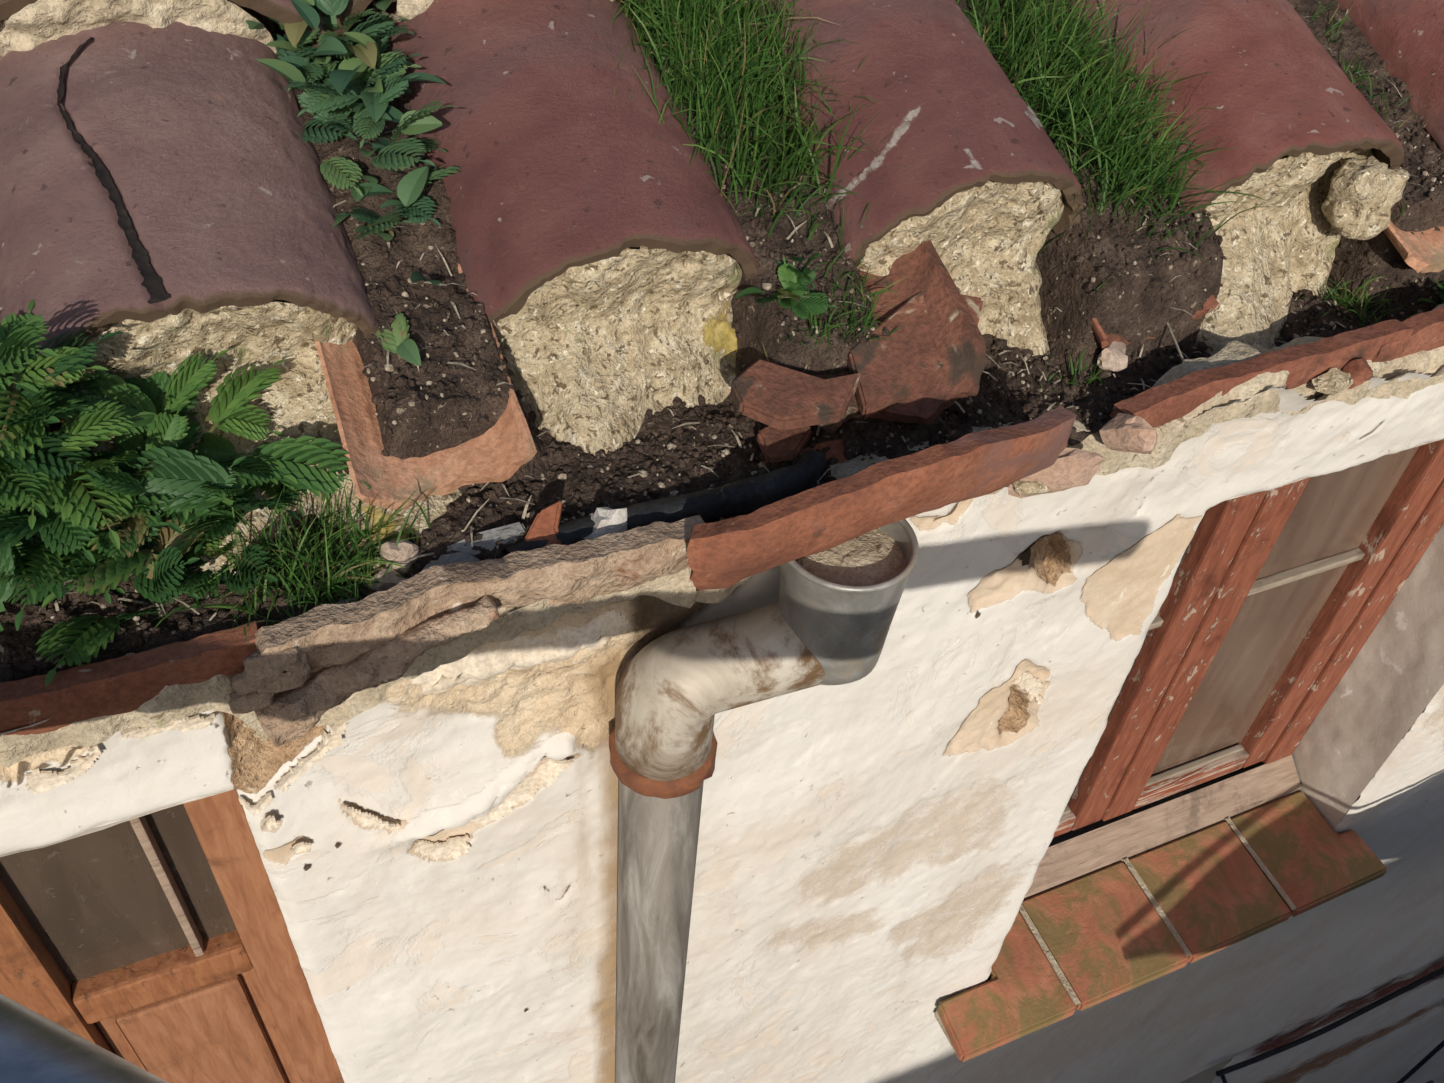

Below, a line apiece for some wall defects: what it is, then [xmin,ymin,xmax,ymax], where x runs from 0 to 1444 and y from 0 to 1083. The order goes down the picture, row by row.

crack [57,37,171,304]
flaking render [967,514,1202,641]
spalling [121,515,705,871]
flaking render [943,659,1050,756]
flaking render [0,744,102,794]
corrosion [1249,957,1444,1058]
corrosion [1264,999,1444,1083]